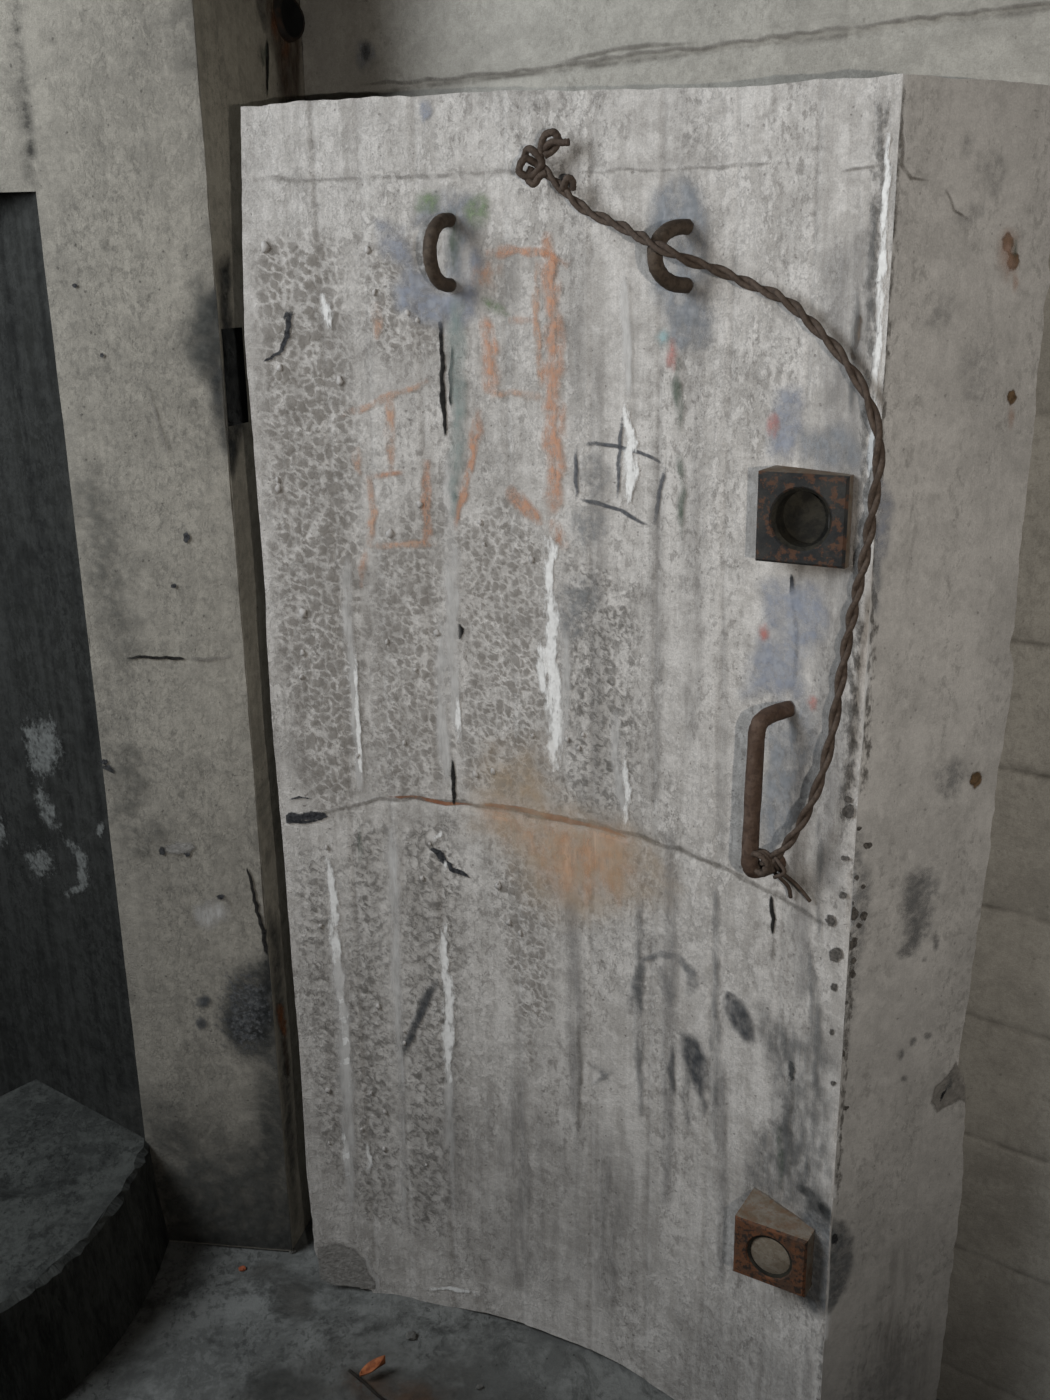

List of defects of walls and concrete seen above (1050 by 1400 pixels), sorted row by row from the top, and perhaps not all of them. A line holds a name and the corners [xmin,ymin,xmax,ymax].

crack [457,624,465,639]
crack [322,760,812,952]
water stain [152,923,294,1249]
spalling [932,1063,966,1112]